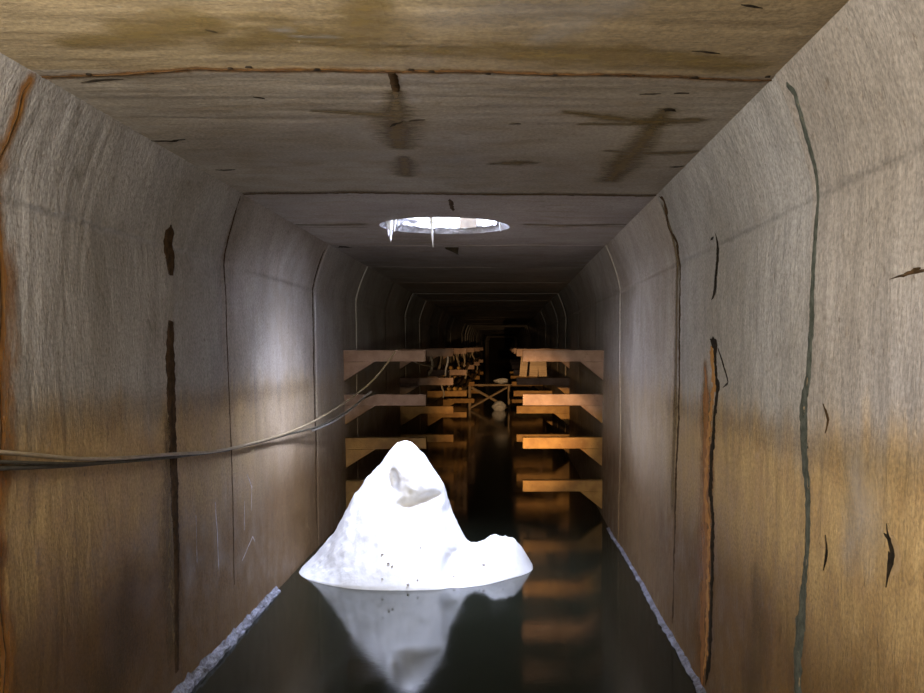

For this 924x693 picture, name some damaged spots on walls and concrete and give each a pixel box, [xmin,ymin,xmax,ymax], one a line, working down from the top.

rust [0,214,15,693]
crack [163,224,175,275]
crack [165,320,180,674]
rust [0,67,601,177]
rust [565,108,703,182]
rust [662,205,679,507]
rust [699,364,711,686]
crack [786,82,829,693]
crack [891,267,924,279]